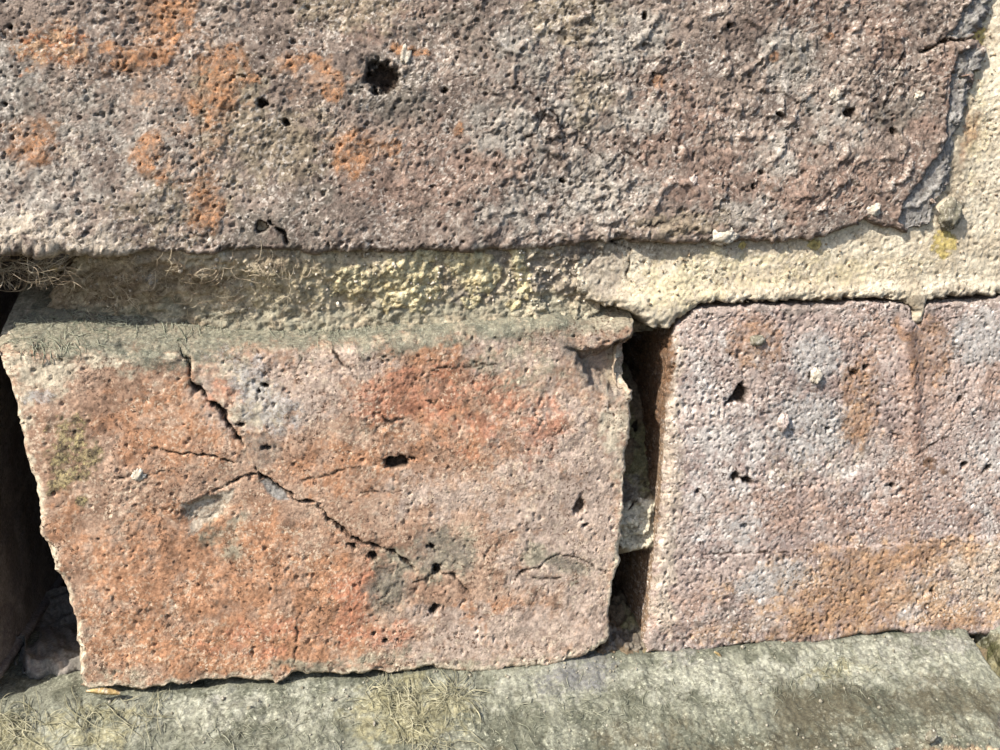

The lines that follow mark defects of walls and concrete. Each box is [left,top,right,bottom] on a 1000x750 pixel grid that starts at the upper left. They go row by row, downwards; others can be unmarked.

crack [119,356,468,600]